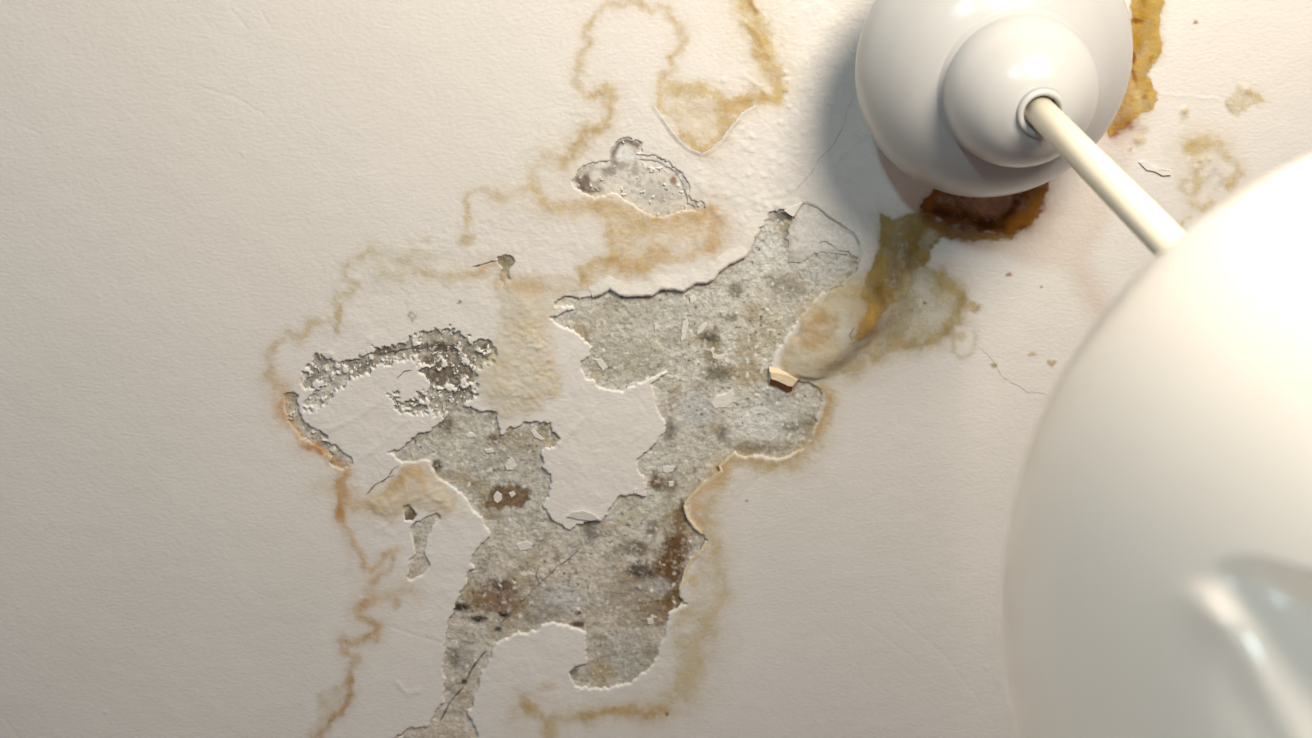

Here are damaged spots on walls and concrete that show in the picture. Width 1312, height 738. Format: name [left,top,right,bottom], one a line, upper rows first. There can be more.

leakage [658,0,786,153]
peeling [652,105,757,157]
peeling [572,137,705,217]
leakage [580,231,664,284]
leakage [634,211,719,251]
leakage [839,210,1017,372]
spalling [284,201,864,738]
leakage [693,384,833,527]
leakage [319,677,354,734]
leakage [580,706,667,720]